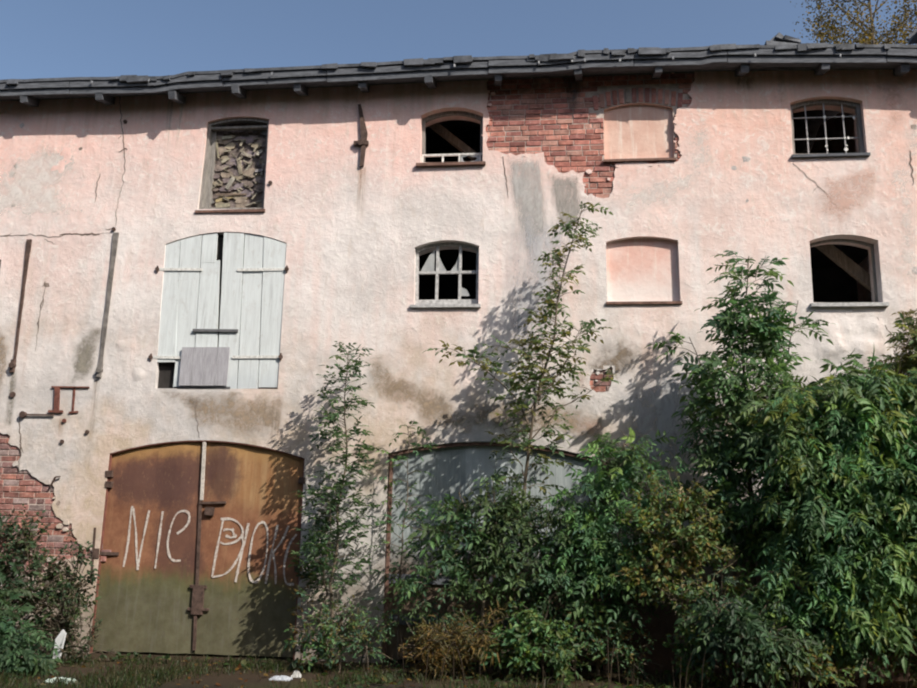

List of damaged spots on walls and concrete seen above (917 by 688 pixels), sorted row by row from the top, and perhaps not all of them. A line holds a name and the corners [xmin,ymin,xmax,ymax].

crack [3,96,128,243]
spalling [482,72,695,198]
crack [793,163,850,209]
leakage [376,365,598,435]
spalling [583,363,620,397]
spalling [0,433,112,573]